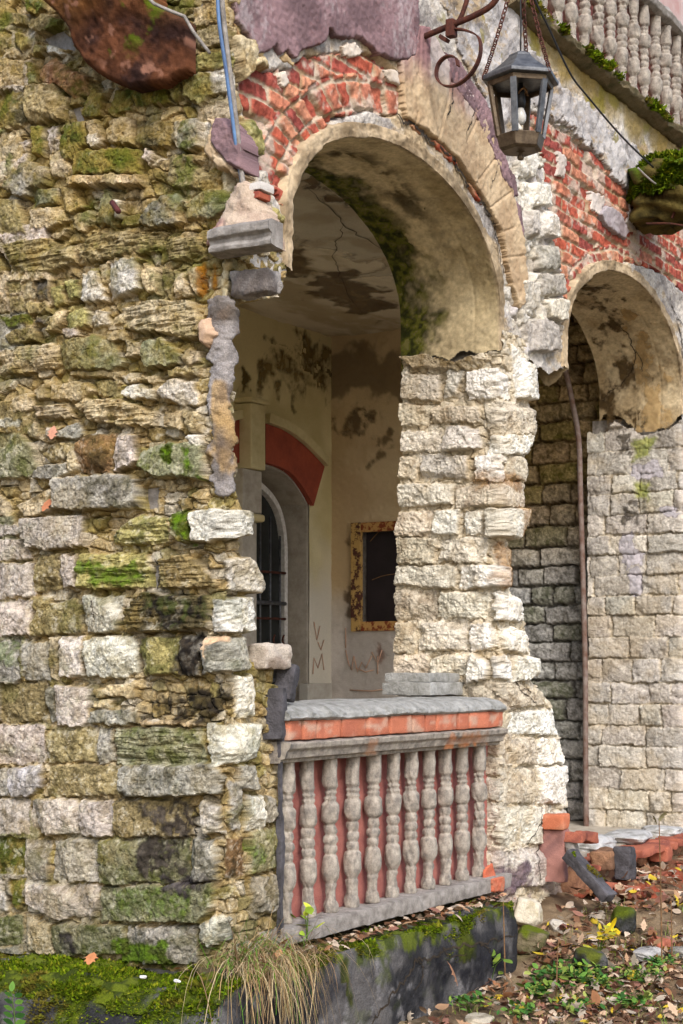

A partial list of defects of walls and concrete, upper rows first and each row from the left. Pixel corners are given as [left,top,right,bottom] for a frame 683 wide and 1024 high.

flaking render [204,0,420,315]
crack [305,184,381,305]
flaking render [440,0,683,299]
damp [332,408,376,438]